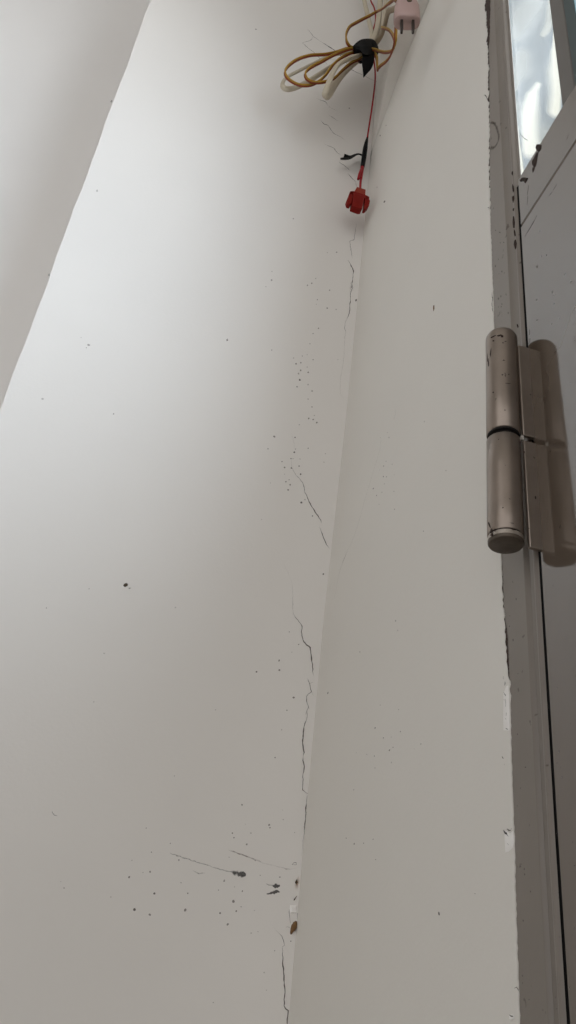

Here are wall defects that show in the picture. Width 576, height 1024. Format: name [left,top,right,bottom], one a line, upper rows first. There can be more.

crack [294,615,313,838]
crack [281,937,289,1024]